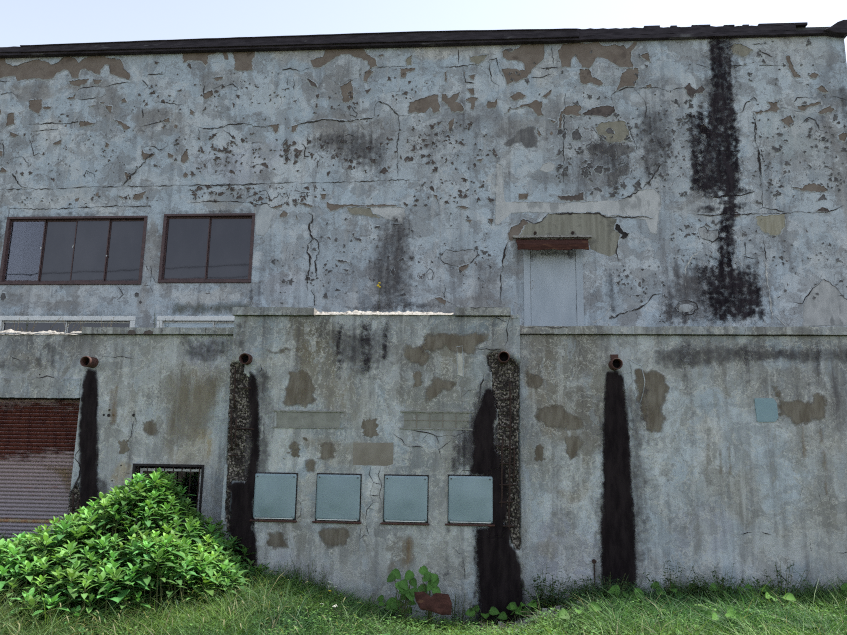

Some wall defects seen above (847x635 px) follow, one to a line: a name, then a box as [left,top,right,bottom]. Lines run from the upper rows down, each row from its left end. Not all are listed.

crack [78,73,161,100]
crack [0,100,420,306]
peeling [58,42,708,303]
spalling [315,291,455,315]
crack [423,87,844,350]
leakage [666,38,768,322]
corrosion [0,400,79,460]
leakage [78,369,107,514]
corrosion [414,591,452,615]
leakage [453,384,525,625]
spalling [486,351,543,550]
leakage [598,370,643,592]